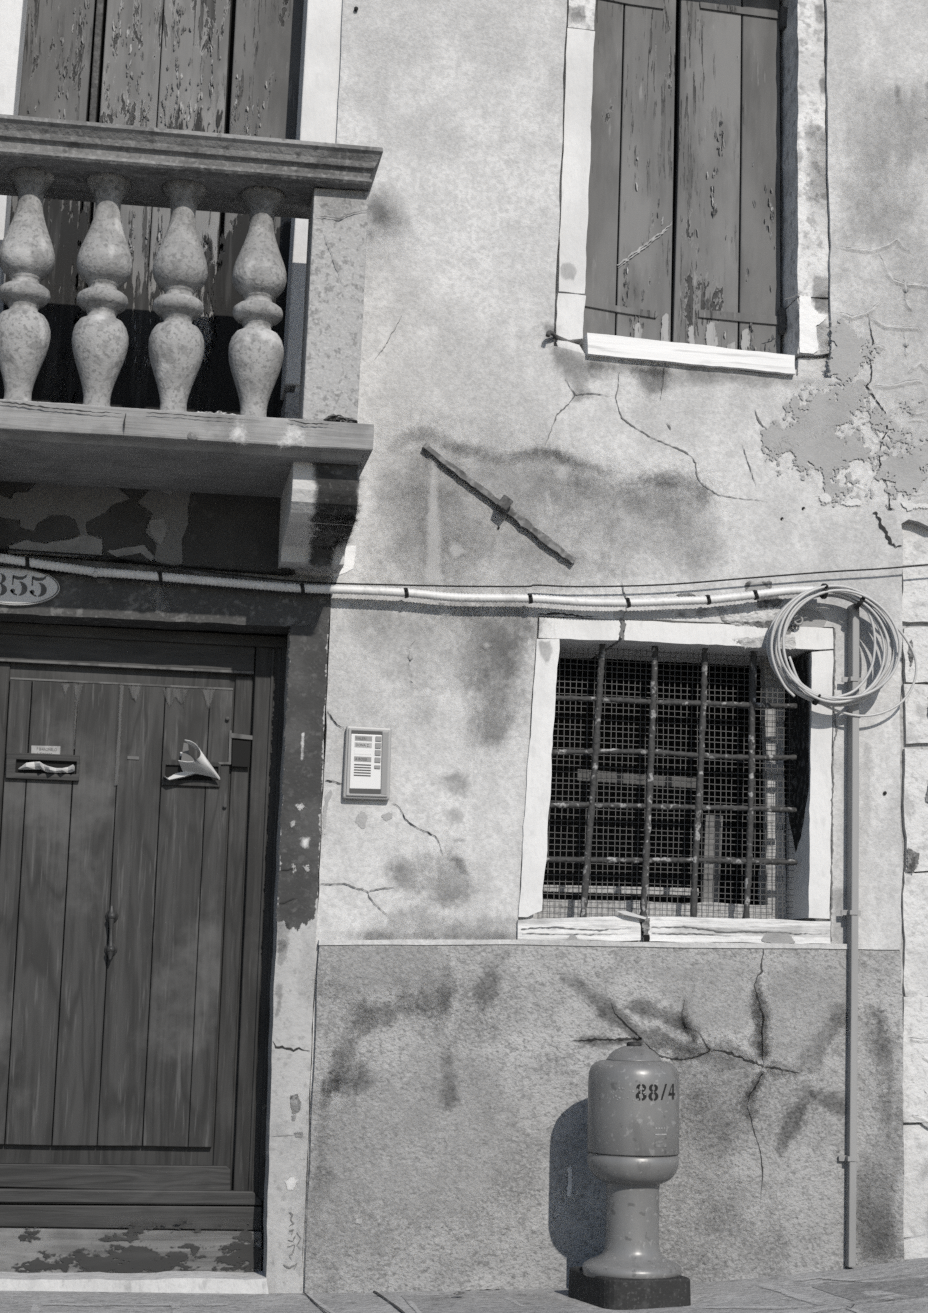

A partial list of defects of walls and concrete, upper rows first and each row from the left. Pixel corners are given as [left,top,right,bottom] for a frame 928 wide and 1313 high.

crack [545,365,767,501]
flaking render [761,296,928,511]
peeling [0,483,191,565]
peeling [331,545,356,577]
crack [521,628,838,1201]
leakage [316,1079,492,1225]